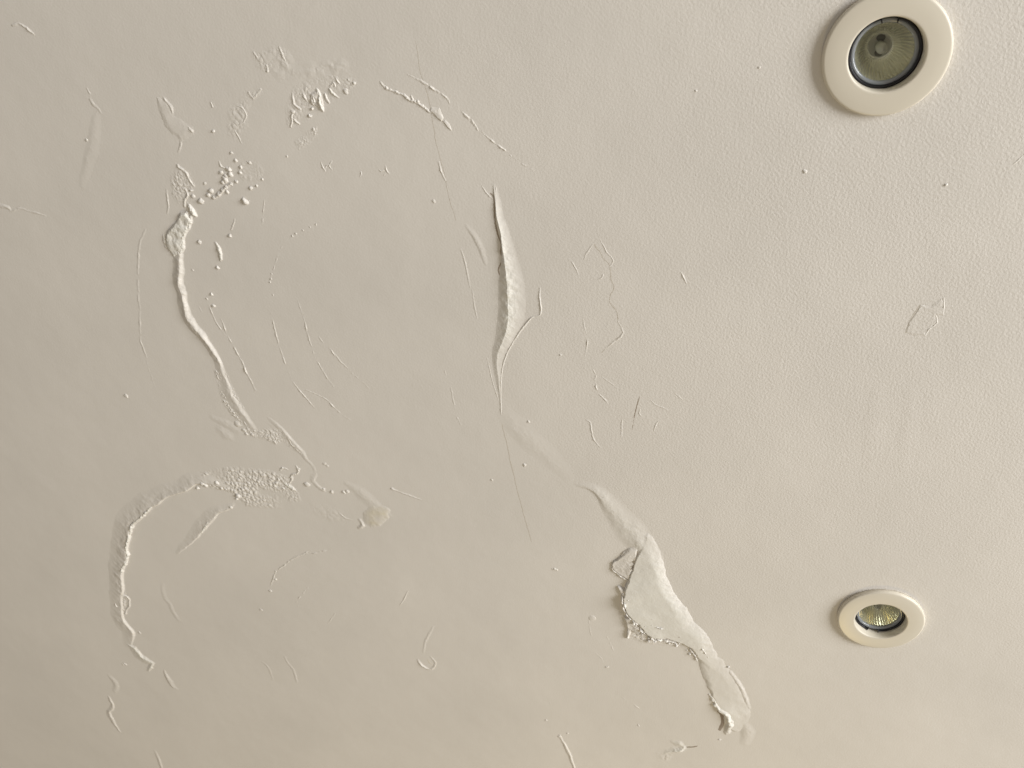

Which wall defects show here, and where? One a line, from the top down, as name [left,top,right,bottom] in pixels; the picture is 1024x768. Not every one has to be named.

peeling [162,163,317,473]
peeling [108,466,294,690]